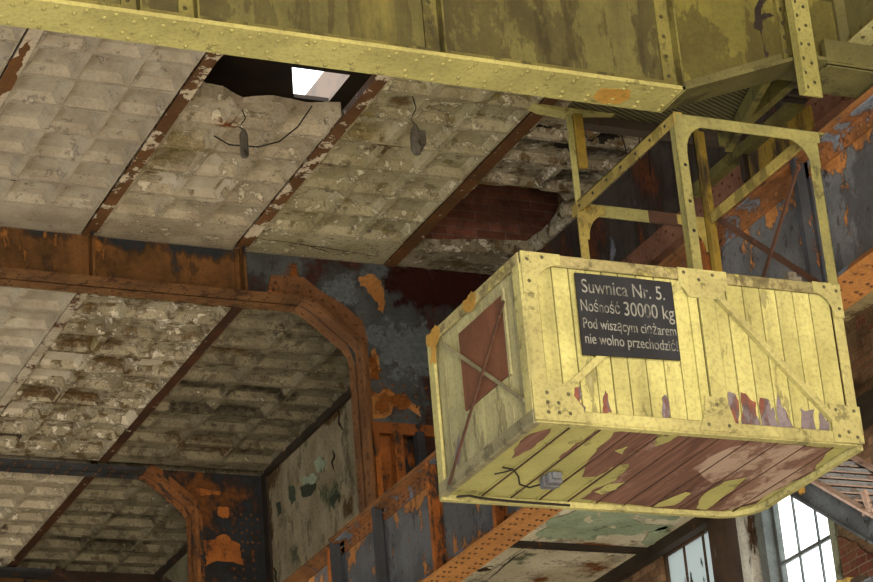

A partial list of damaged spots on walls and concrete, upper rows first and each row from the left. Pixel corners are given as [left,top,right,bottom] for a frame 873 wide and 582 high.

rust [0,40,31,96]
spalling [585,133,619,144]
damp [56,334,126,374]
damp [22,386,99,406]
peeling [276,456,327,516]
peeling [536,431,762,546]
rust [217,507,230,518]
rust [204,534,243,566]
rust [580,563,609,577]